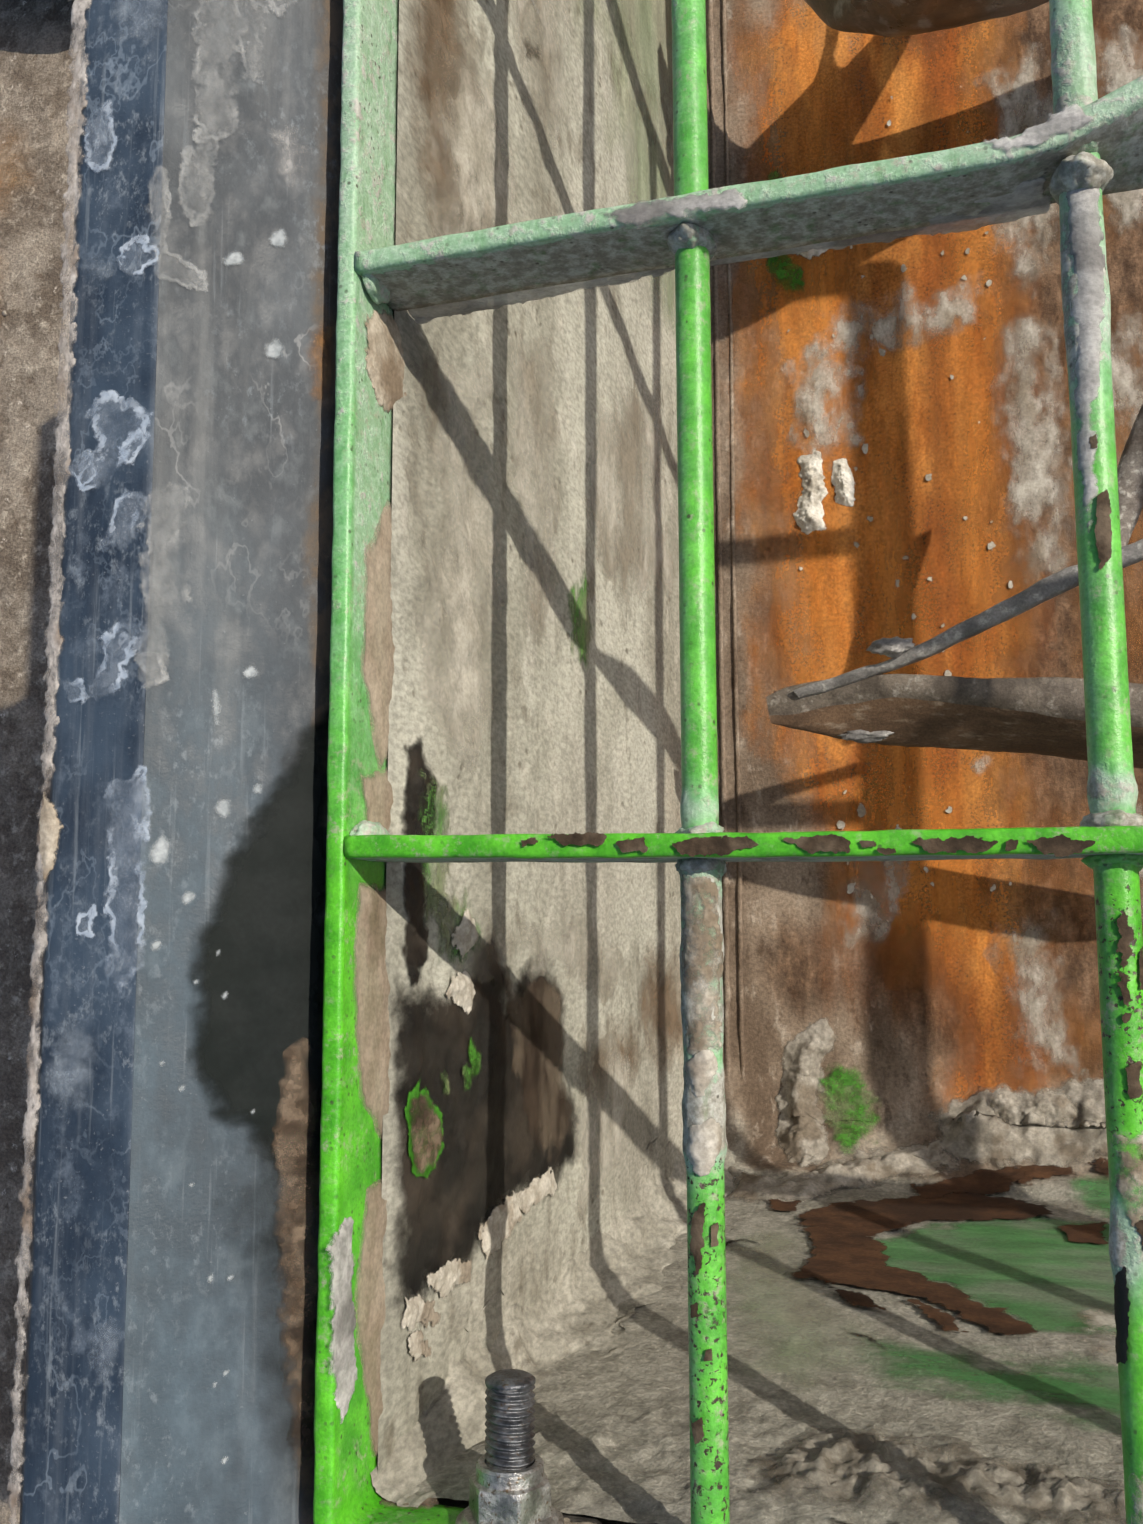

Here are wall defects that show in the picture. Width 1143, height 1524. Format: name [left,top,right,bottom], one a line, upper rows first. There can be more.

water stain [85,106,117,170]
corrosion [750,0,1001,181]
water stain [120,235,159,274]
water stain [75,474,96,491]
water stain [93,390,150,464]
corrosion [736,223,1020,685]
peeling [402,740,437,835]
corrosion [777,726,1011,831]
peeling [1116,907,1143,1023]
peeling [395,862,578,1361]
corrosion [271,1040,318,1454]
peeling [1114,1266,1131,1364]